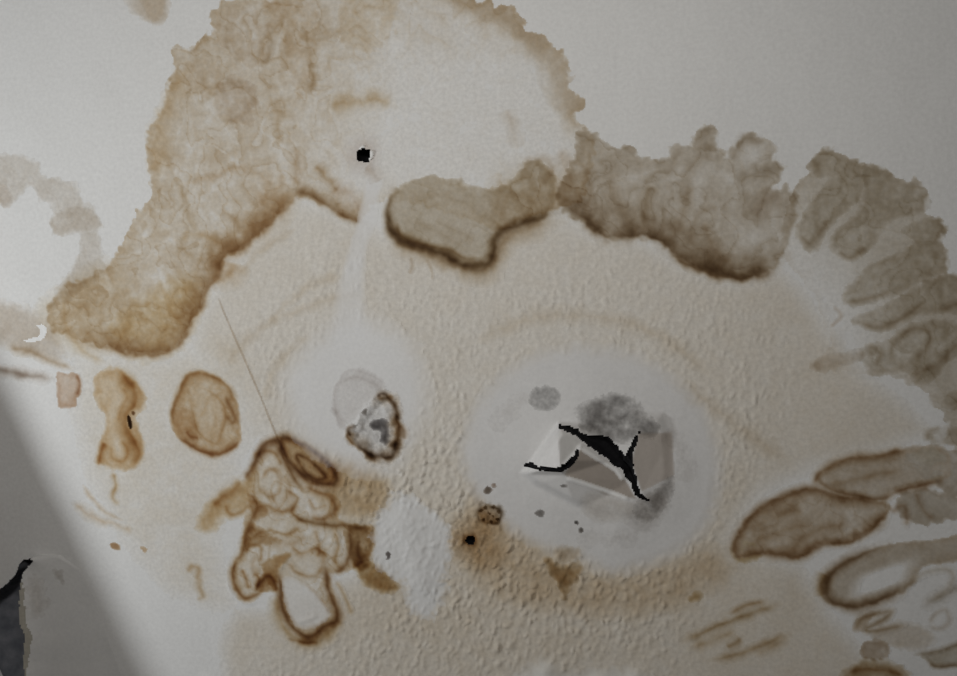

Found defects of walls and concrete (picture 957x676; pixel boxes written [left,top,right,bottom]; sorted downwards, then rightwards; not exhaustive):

damp [0,0,589,366]
spalling [343,387,410,469]
damp [0,145,957,676]
crack [524,424,650,501]